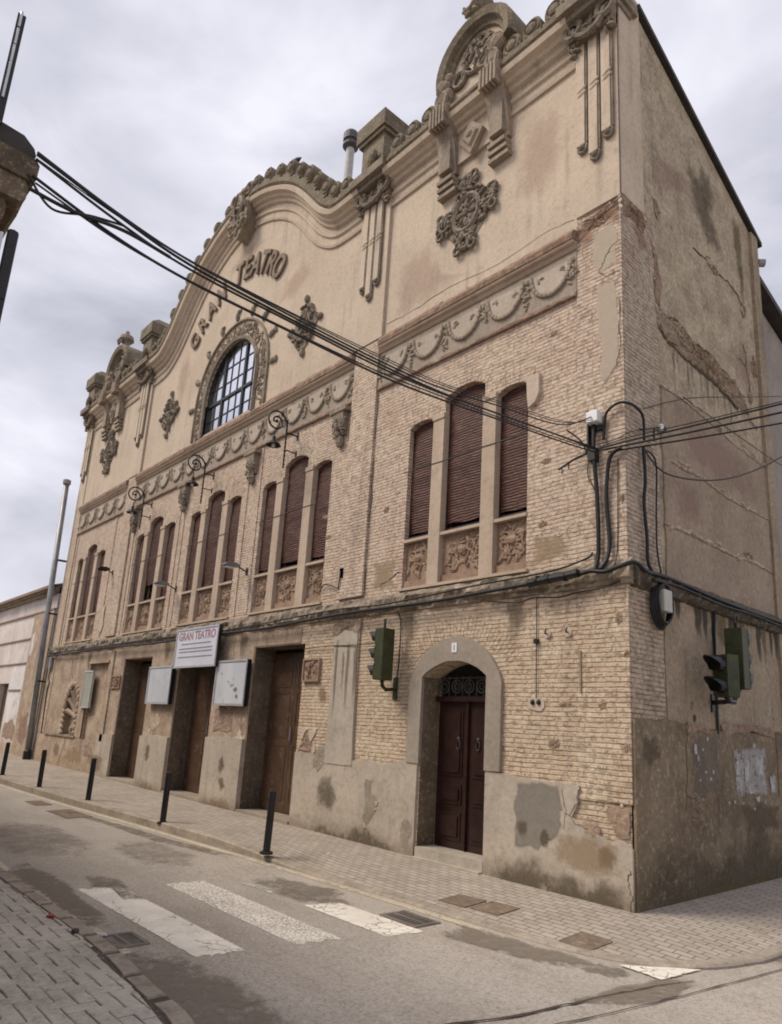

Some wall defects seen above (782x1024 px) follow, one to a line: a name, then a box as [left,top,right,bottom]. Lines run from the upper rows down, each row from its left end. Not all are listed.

damp [693,170,717,243]
spalling [576,193,753,418]
crack [693,247,743,315]
peeling [362,779,378,829]
spalling [582,804,631,839]
damp [500,831,622,910]